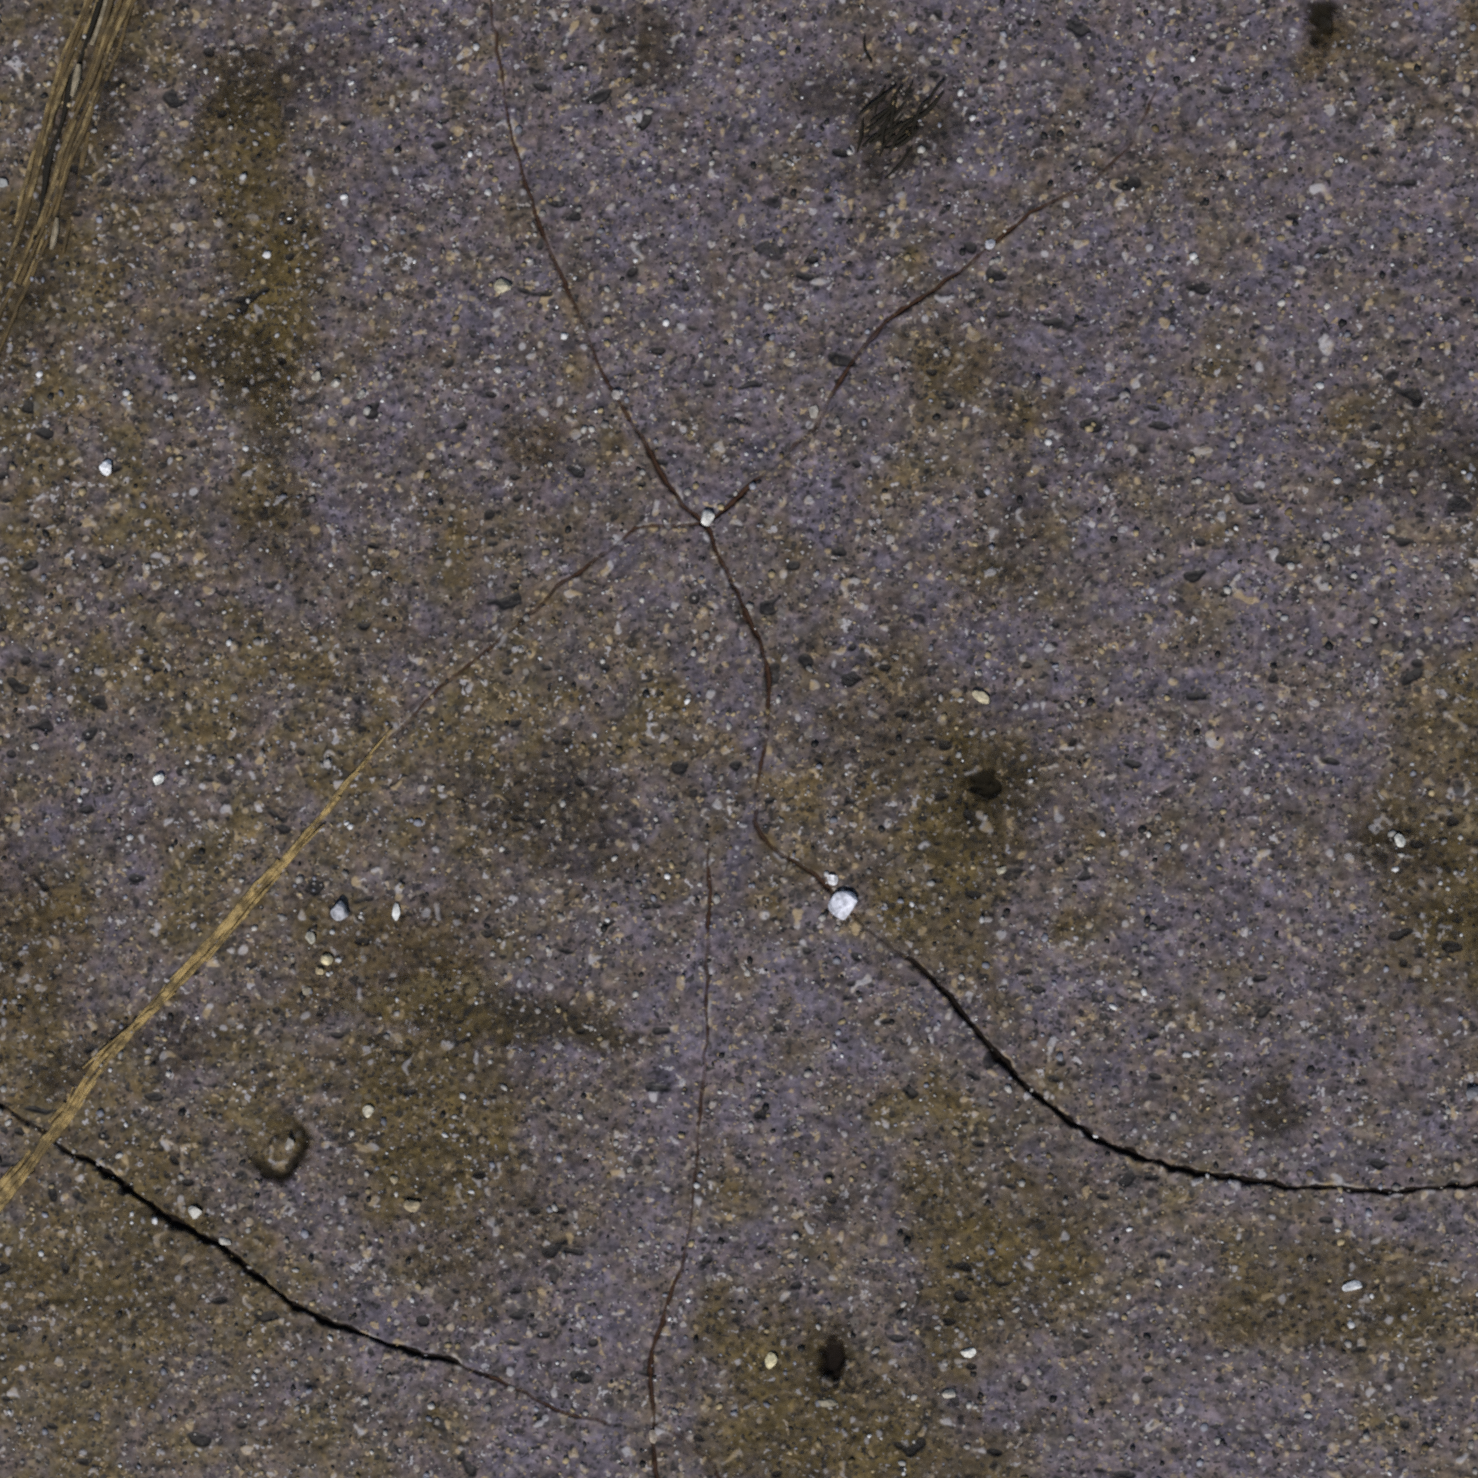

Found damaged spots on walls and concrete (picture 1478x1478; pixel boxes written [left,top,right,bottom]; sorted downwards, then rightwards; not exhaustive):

crack [490,5,771,708]
crack [831,149,1127,396]
crack [389,636,502,739]
crack [753,745,1478,1195]
crack [0,1104,606,1423]